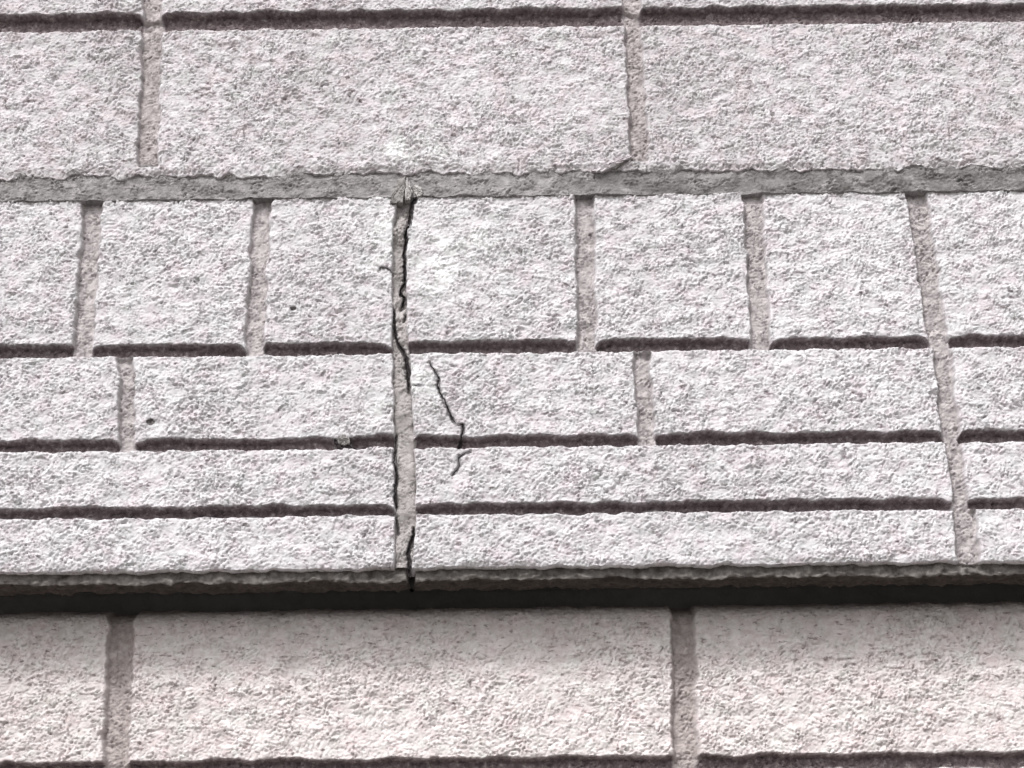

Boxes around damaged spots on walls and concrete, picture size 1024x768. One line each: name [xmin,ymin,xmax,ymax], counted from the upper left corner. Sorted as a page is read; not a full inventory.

crack [379,182,470,475]
crack [393,435,415,578]